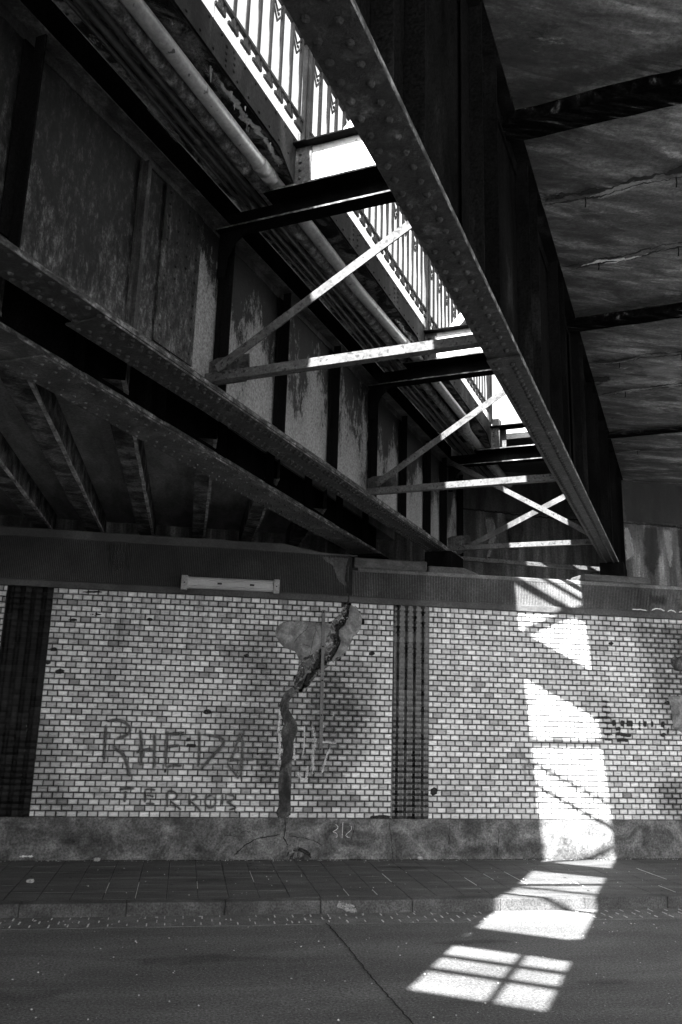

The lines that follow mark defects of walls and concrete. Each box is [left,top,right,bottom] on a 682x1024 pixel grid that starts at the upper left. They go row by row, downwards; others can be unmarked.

crack [545,166,682,207]
crack [563,242,682,272]
crack [278,603,361,693]
crack [225,820,318,856]